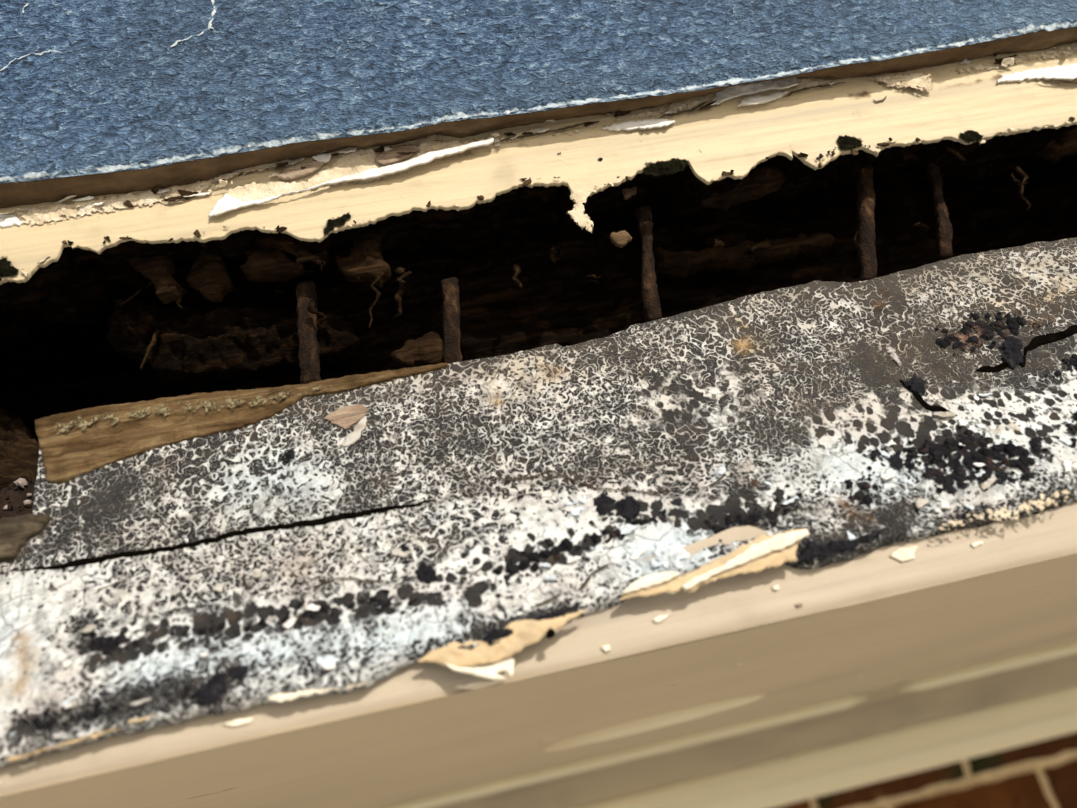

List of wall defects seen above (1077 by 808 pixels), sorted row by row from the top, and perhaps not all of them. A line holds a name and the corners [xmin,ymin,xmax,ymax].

water stain [681,56,880,90]
water stain [529,89,667,110]
water stain [97,137,299,173]
peeling [0,75,837,228]
spalling [874,165,1077,277]
spalling [182,176,859,380]
crack [709,458,732,486]
crack [8,470,677,571]
mould [593,493,642,520]
crack [310,577,380,592]
crack [534,563,612,606]
peeling [417,610,586,679]